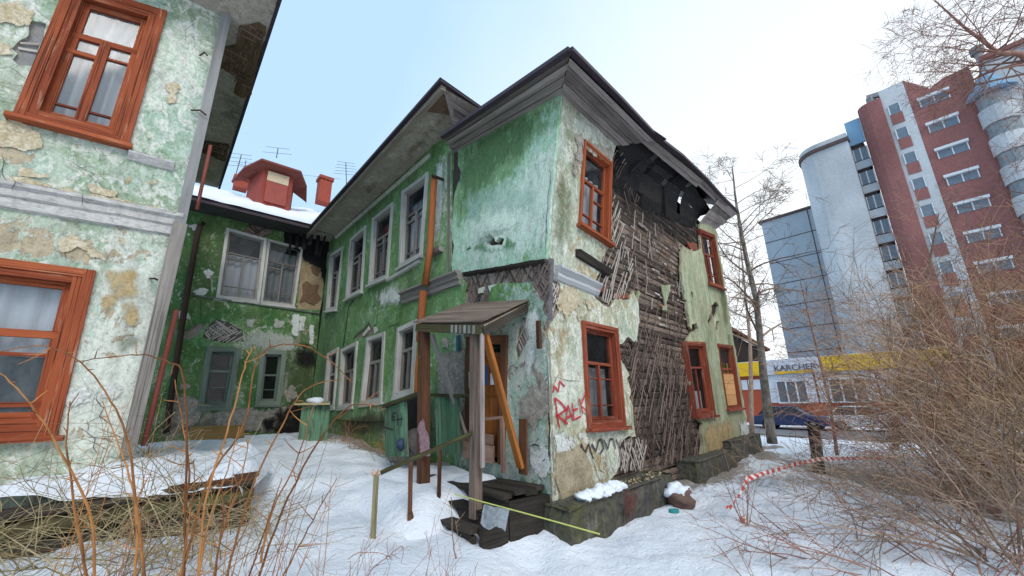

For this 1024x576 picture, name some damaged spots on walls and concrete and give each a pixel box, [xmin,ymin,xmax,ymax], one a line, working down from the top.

peeling [0,1,46,66]
flaking render [220,22,266,99]
peeling [0,119,42,152]
spalling [9,167,158,208]
peeling [57,233,124,261]
flaking render [297,252,324,310]
peeling [179,311,297,351]
flaking render [463,175,700,480]
spalling [518,372,593,500]